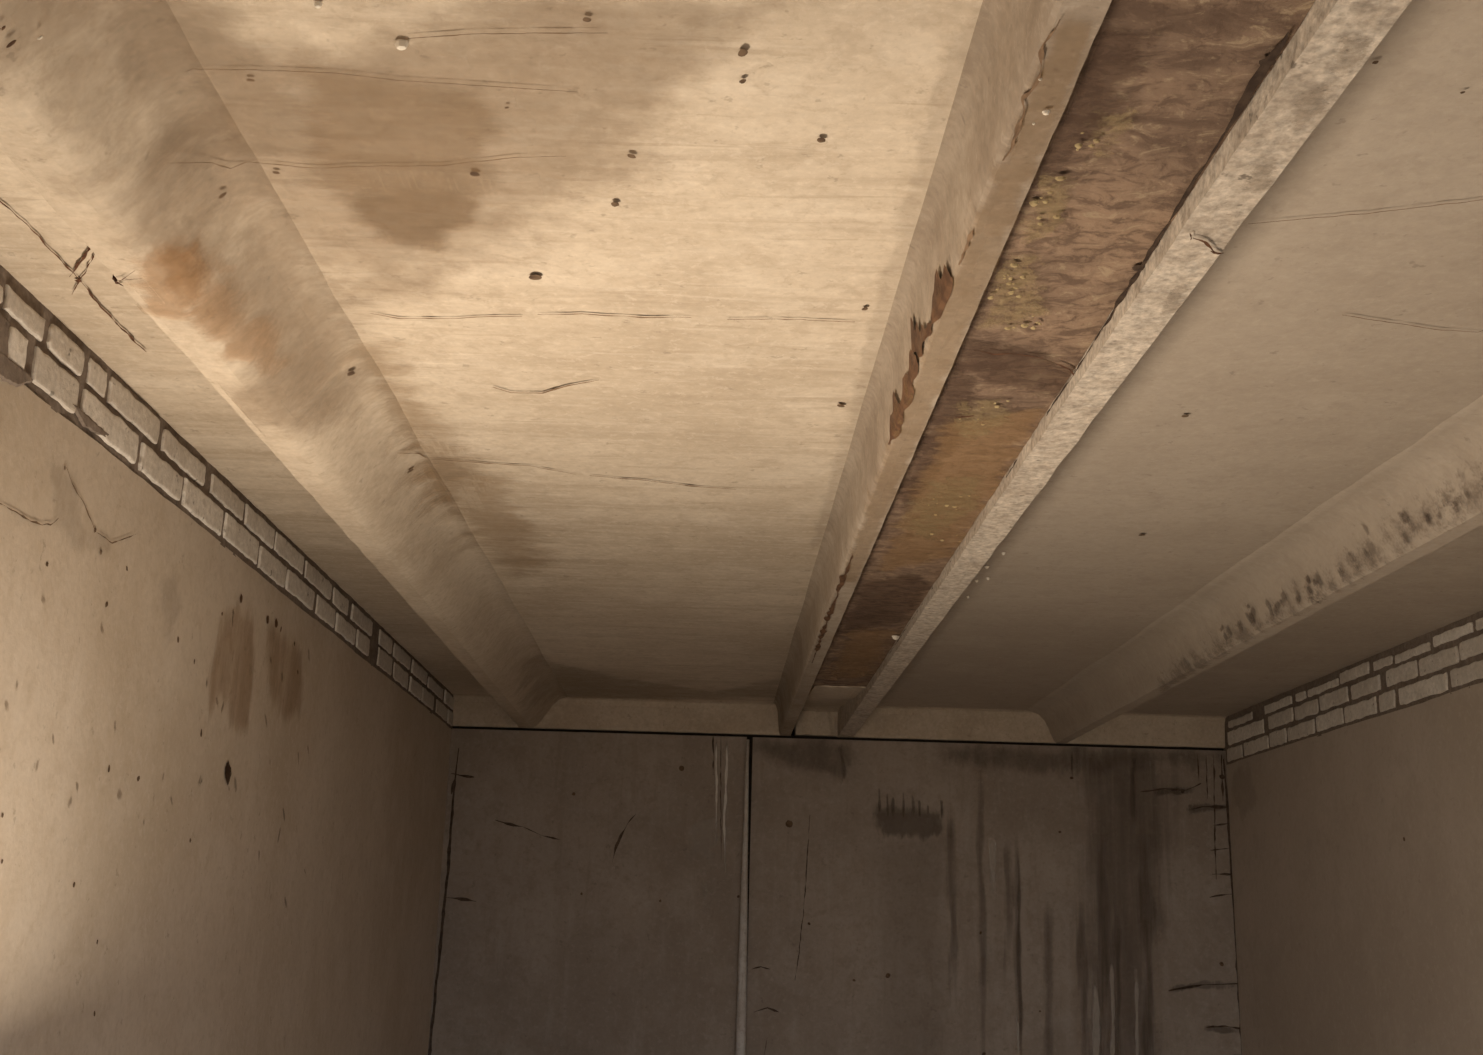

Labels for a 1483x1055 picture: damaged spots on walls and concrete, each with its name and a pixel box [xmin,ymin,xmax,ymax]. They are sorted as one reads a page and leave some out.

crack [975,19,1289,416]
crack [0,465,133,555]